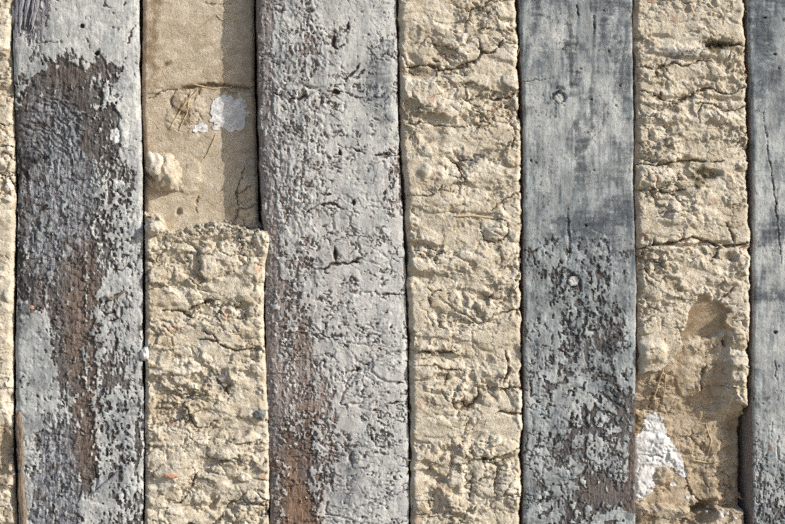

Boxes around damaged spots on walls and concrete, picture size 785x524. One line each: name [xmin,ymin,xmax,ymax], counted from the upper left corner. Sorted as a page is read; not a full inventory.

crack [406,40,503,72]
crack [635,39,746,122]
crack [640,158,722,166]
crack [481,191,520,243]
spalling [17,0,407,524]
peeling [528,228,633,341]
crack [640,223,749,262]
crack [410,350,465,383]
crack [502,355,534,397]
crack [495,408,521,416]
spalling [526,286,748,524]
crack [466,448,519,497]